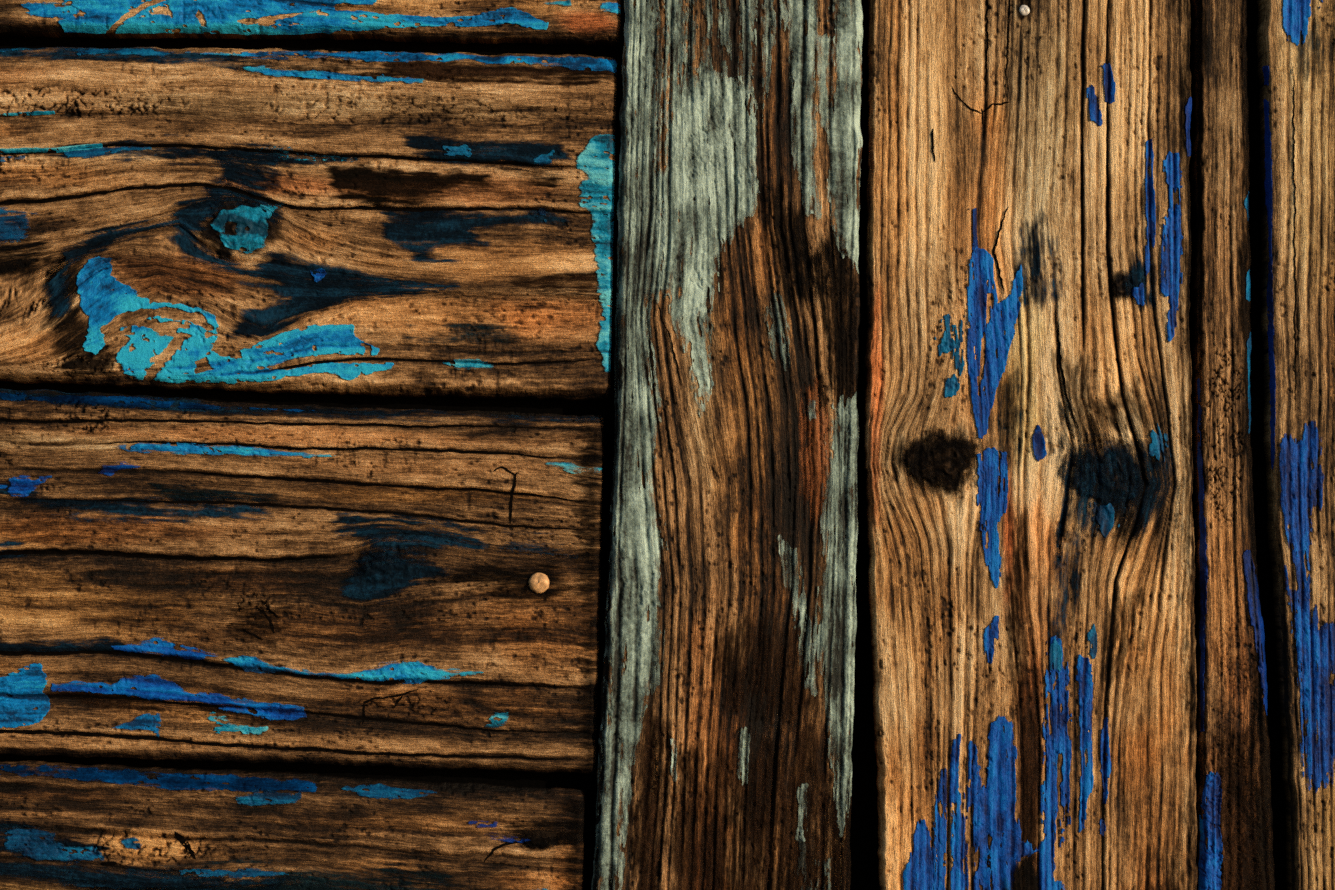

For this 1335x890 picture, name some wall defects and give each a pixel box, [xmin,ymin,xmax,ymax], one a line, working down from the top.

peeling [1282,0,1323,46]
peeling [1132,97,1192,342]
peeling [0,0,863,890]
peeling [935,208,1023,588]
peeling [1262,66,1335,793]
peeling [983,615,999,664]
peeling [903,624,1111,890]
peeling [1198,771,1223,890]
peeling [1243,550,1268,715]